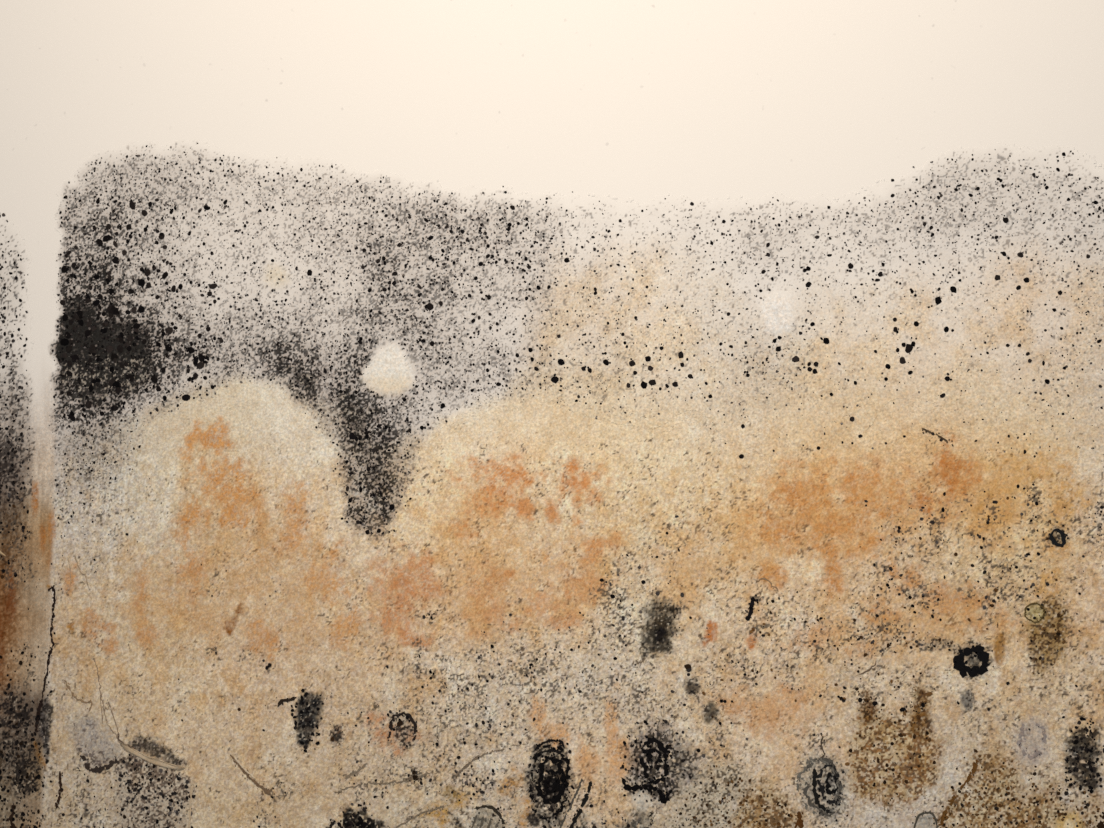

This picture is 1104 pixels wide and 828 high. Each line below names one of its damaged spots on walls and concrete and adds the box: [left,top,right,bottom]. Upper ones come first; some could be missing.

leakage [559,773,637,828]